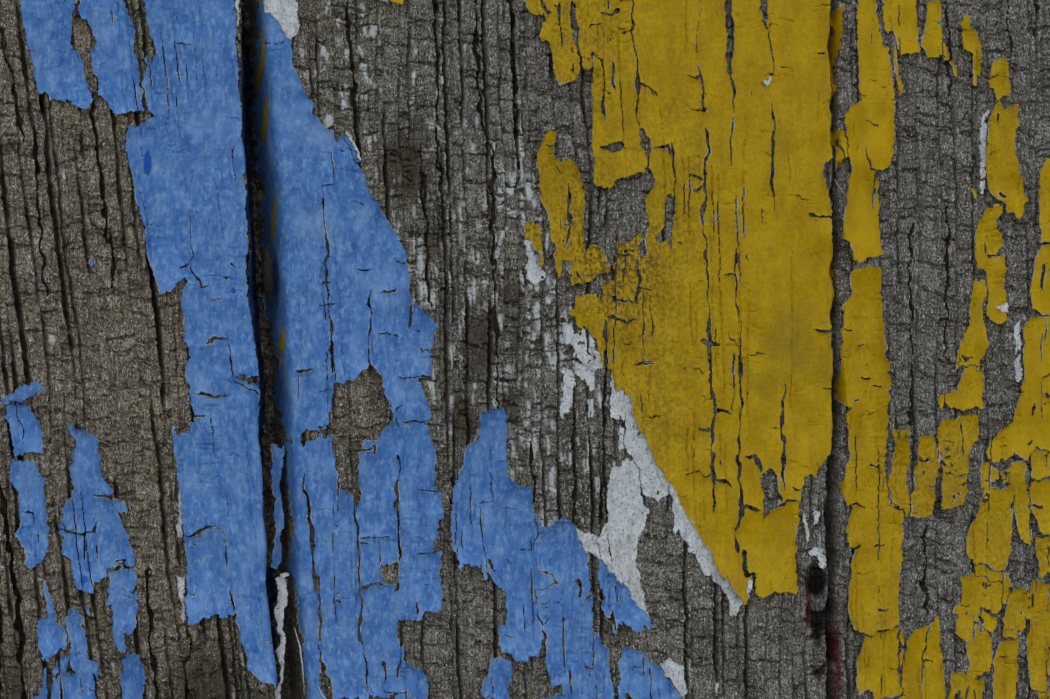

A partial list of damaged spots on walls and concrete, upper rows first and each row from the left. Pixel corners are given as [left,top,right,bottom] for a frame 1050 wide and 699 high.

peeling [0,0,681,699]
peeling [523,0,1050,699]